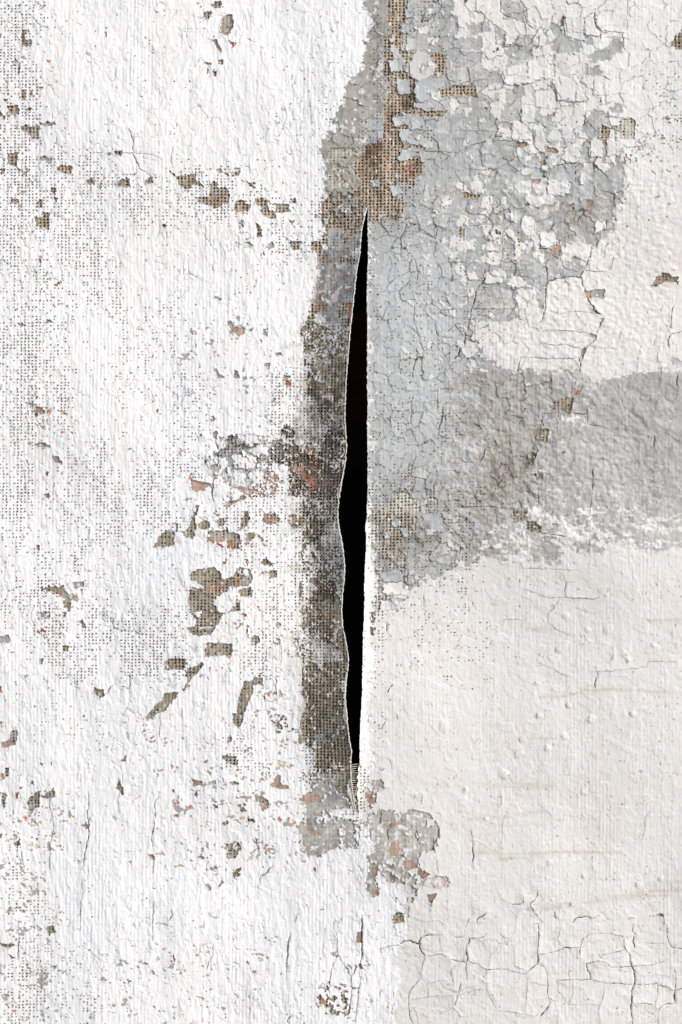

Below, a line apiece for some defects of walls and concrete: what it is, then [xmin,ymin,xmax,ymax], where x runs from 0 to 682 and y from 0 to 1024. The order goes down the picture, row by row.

crack [500,0,628,103]
peeling [0,86,43,120]
peeling [21,121,56,140]
peeling [34,187,59,232]
peeling [117,173,154,188]
crack [424,121,578,212]
peeling [503,53,636,196]
crack [389,184,629,496]
crack [622,306,682,404]
peeling [145,0,488,906]
crack [357,813,439,871]
crack [329,893,682,1024]